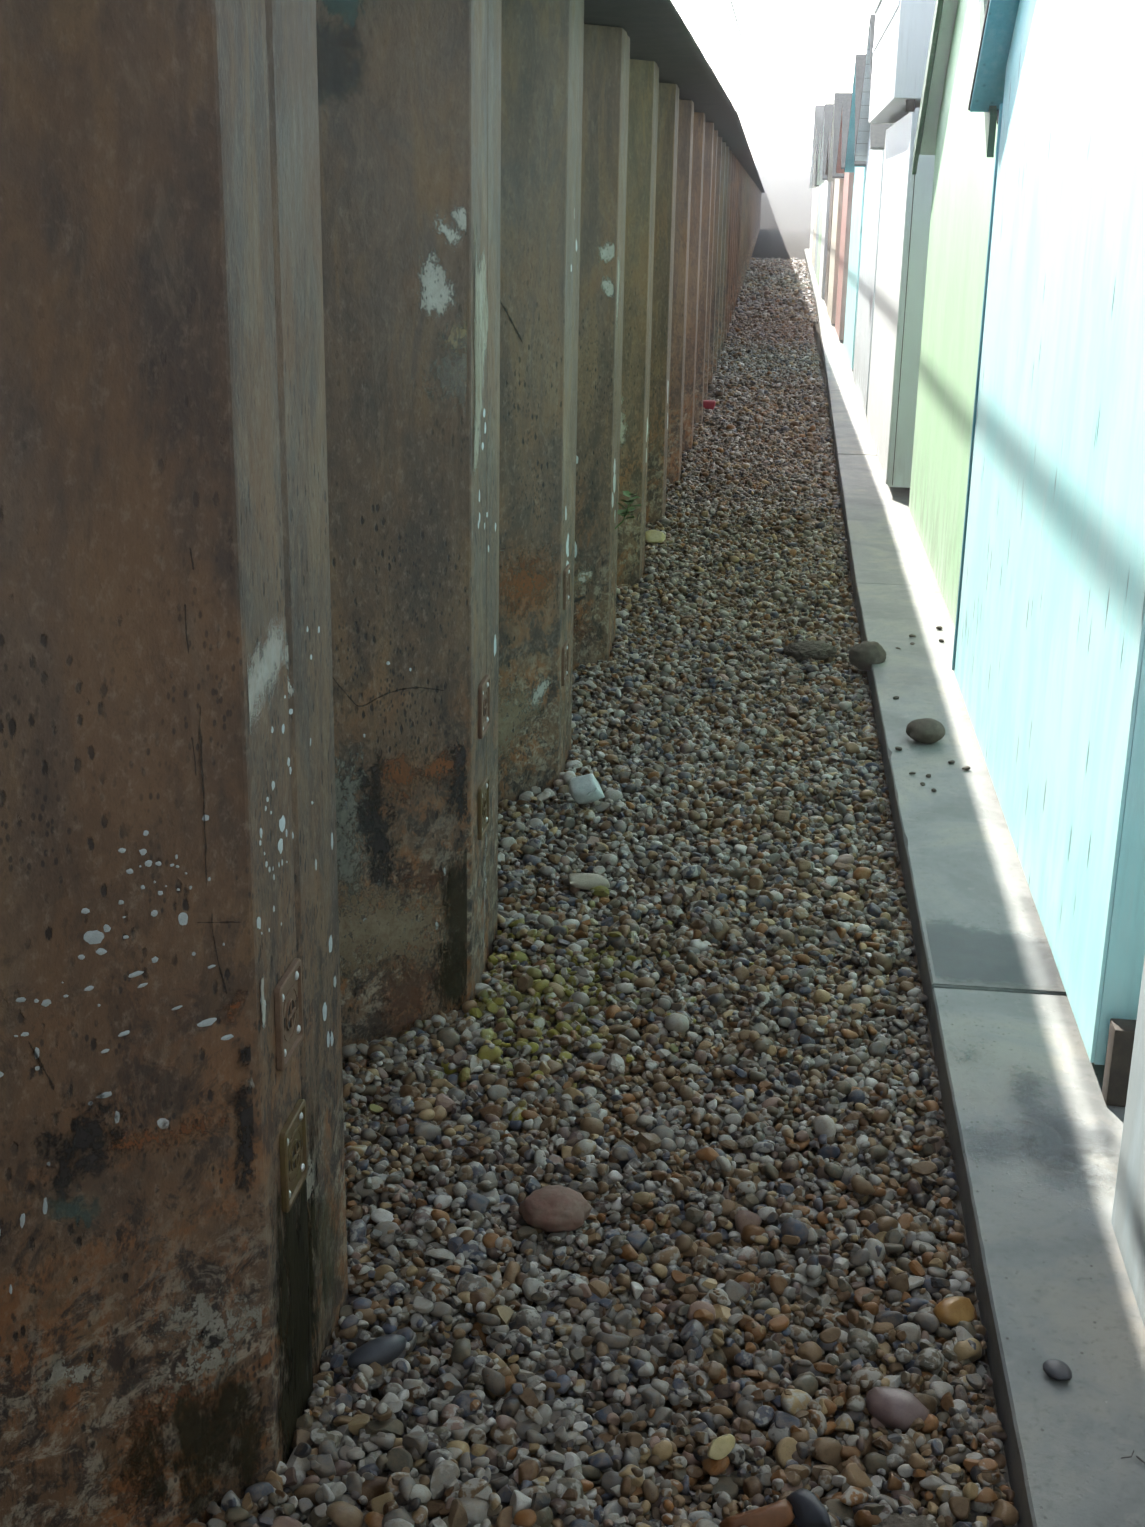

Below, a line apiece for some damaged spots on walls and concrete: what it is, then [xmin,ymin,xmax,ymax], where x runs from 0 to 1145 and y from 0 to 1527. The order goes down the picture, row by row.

damp [316,22,363,104]
damp [34,1094,127,1201]
damp [228,1085,256,1189]
damp [1018,1073,1108,1161]
damp [130,1113,326,1519]